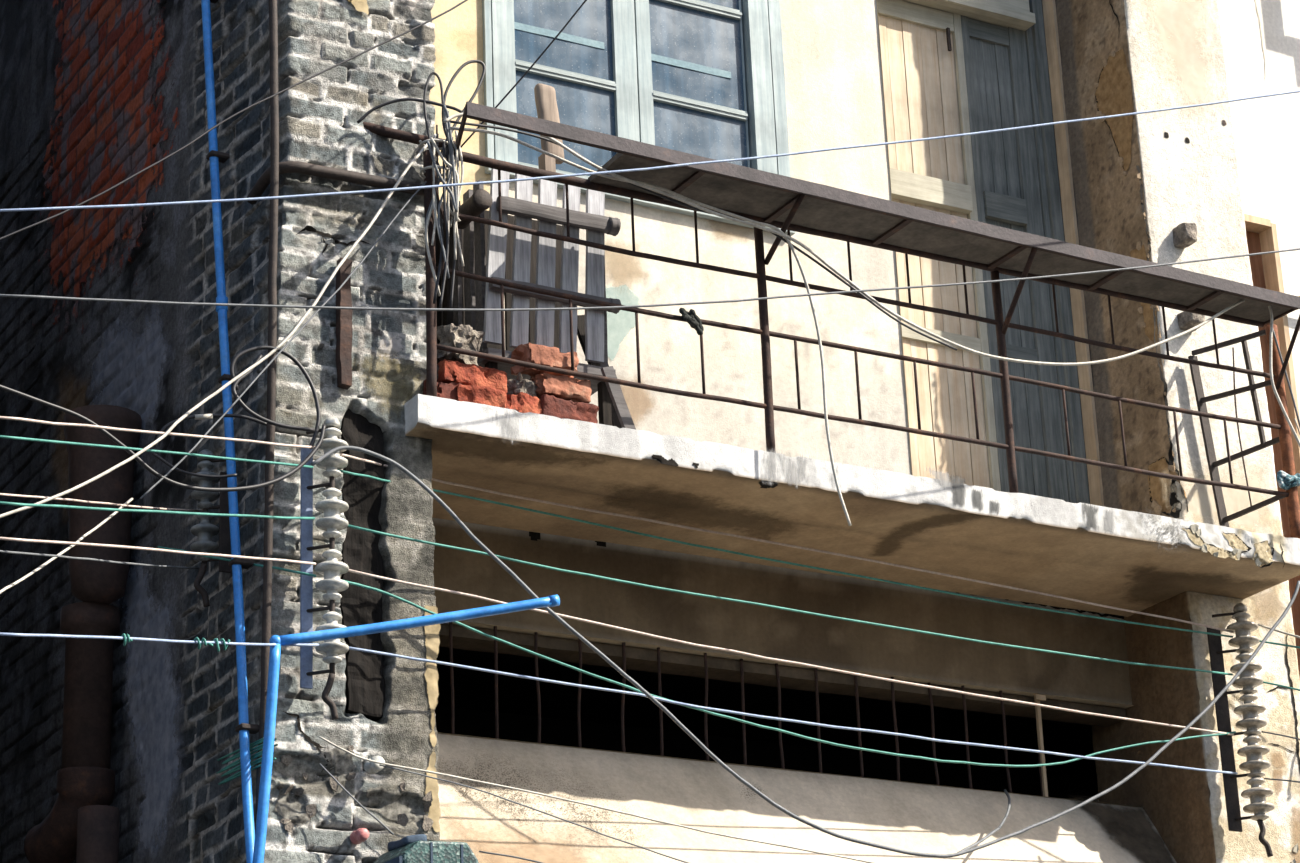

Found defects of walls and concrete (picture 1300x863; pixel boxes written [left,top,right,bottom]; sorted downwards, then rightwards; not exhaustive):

flaking render [35,0,179,342]
crack [296,225,371,253]
peeling [606,285,639,361]
spalling [1138,302,1274,568]